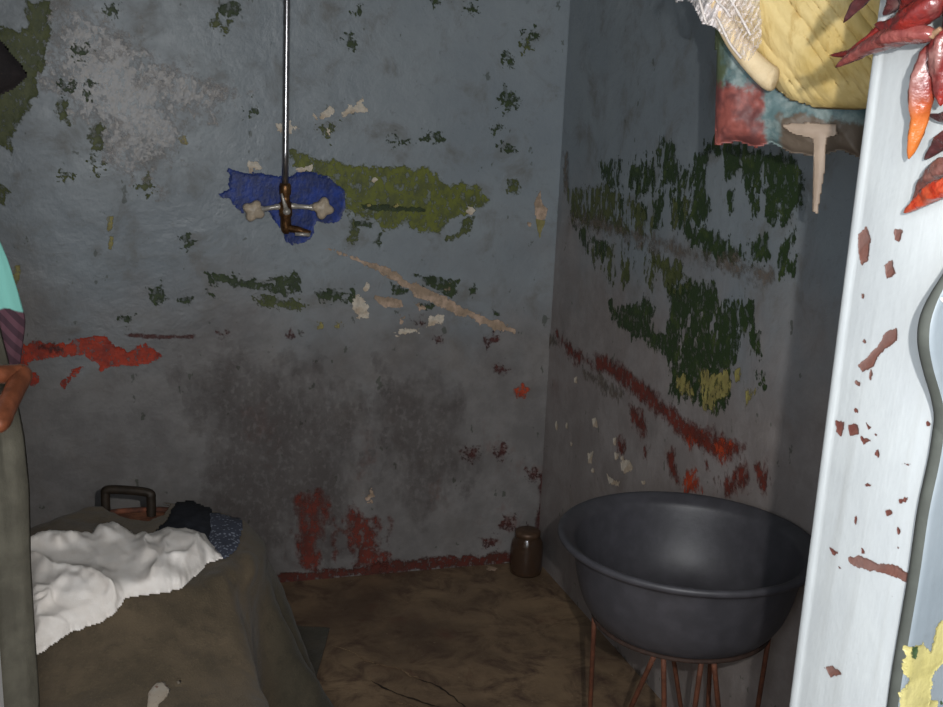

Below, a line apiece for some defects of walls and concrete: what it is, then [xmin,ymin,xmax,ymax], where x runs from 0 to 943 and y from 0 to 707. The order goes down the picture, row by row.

peeling [0,0,52,153]
peeling [55,78,96,127]
peeling [86,122,107,178]
peeling [313,98,368,146]
peeling [388,130,446,148]
peeling [491,83,520,154]
peeling [501,24,540,69]
peeling [203,149,516,350]
peeling [563,134,805,416]
peeling [20,313,194,389]
crack [371,678,465,707]
peeling [898,620,943,707]